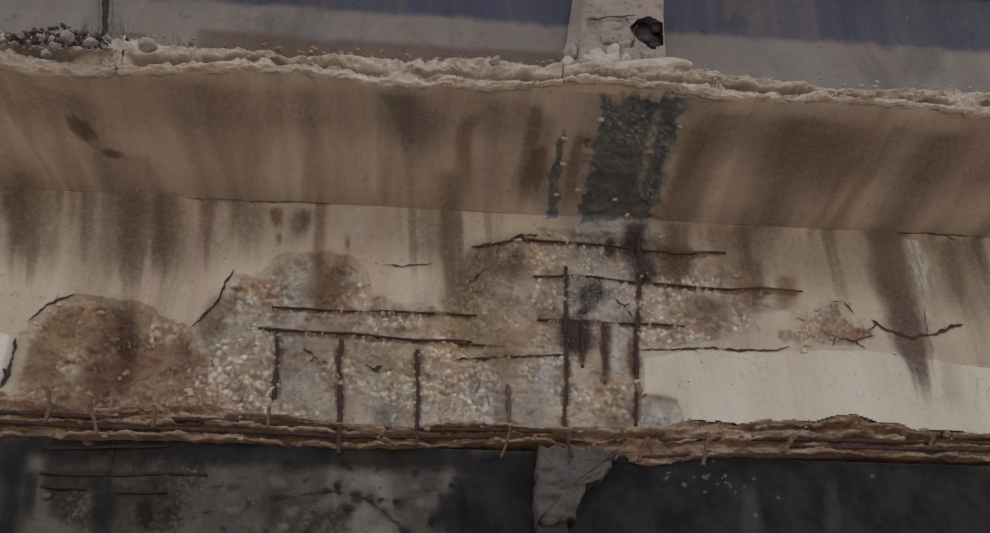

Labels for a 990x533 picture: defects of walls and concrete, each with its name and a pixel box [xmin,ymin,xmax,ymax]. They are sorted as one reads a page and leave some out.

spalling [0,33,990,236]
crack [0,293,76,388]
crack [190,267,235,327]
spalling [186,249,532,451]
corrosion [278,308,470,318]
corrosion [269,330,492,393]
corrosion [522,224,770,411]
spalling [437,227,990,466]
crack [822,301,966,348]
damp [872,232,934,382]
damp [0,439,36,533]
damp [319,481,399,511]